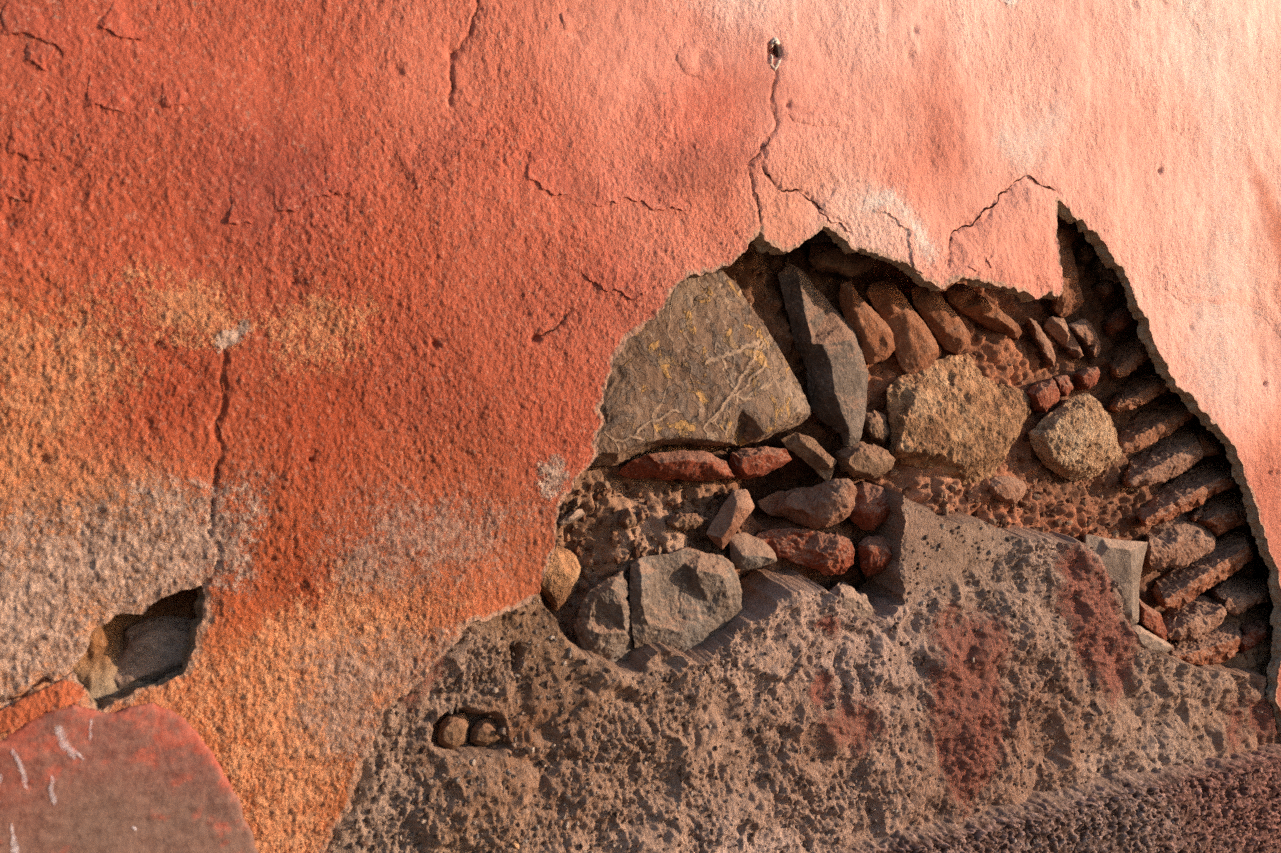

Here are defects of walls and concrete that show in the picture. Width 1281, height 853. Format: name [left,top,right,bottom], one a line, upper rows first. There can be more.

crack [748,78,842,225]
flaking render [327,183,1281,853]
flaking render [0,585,206,733]